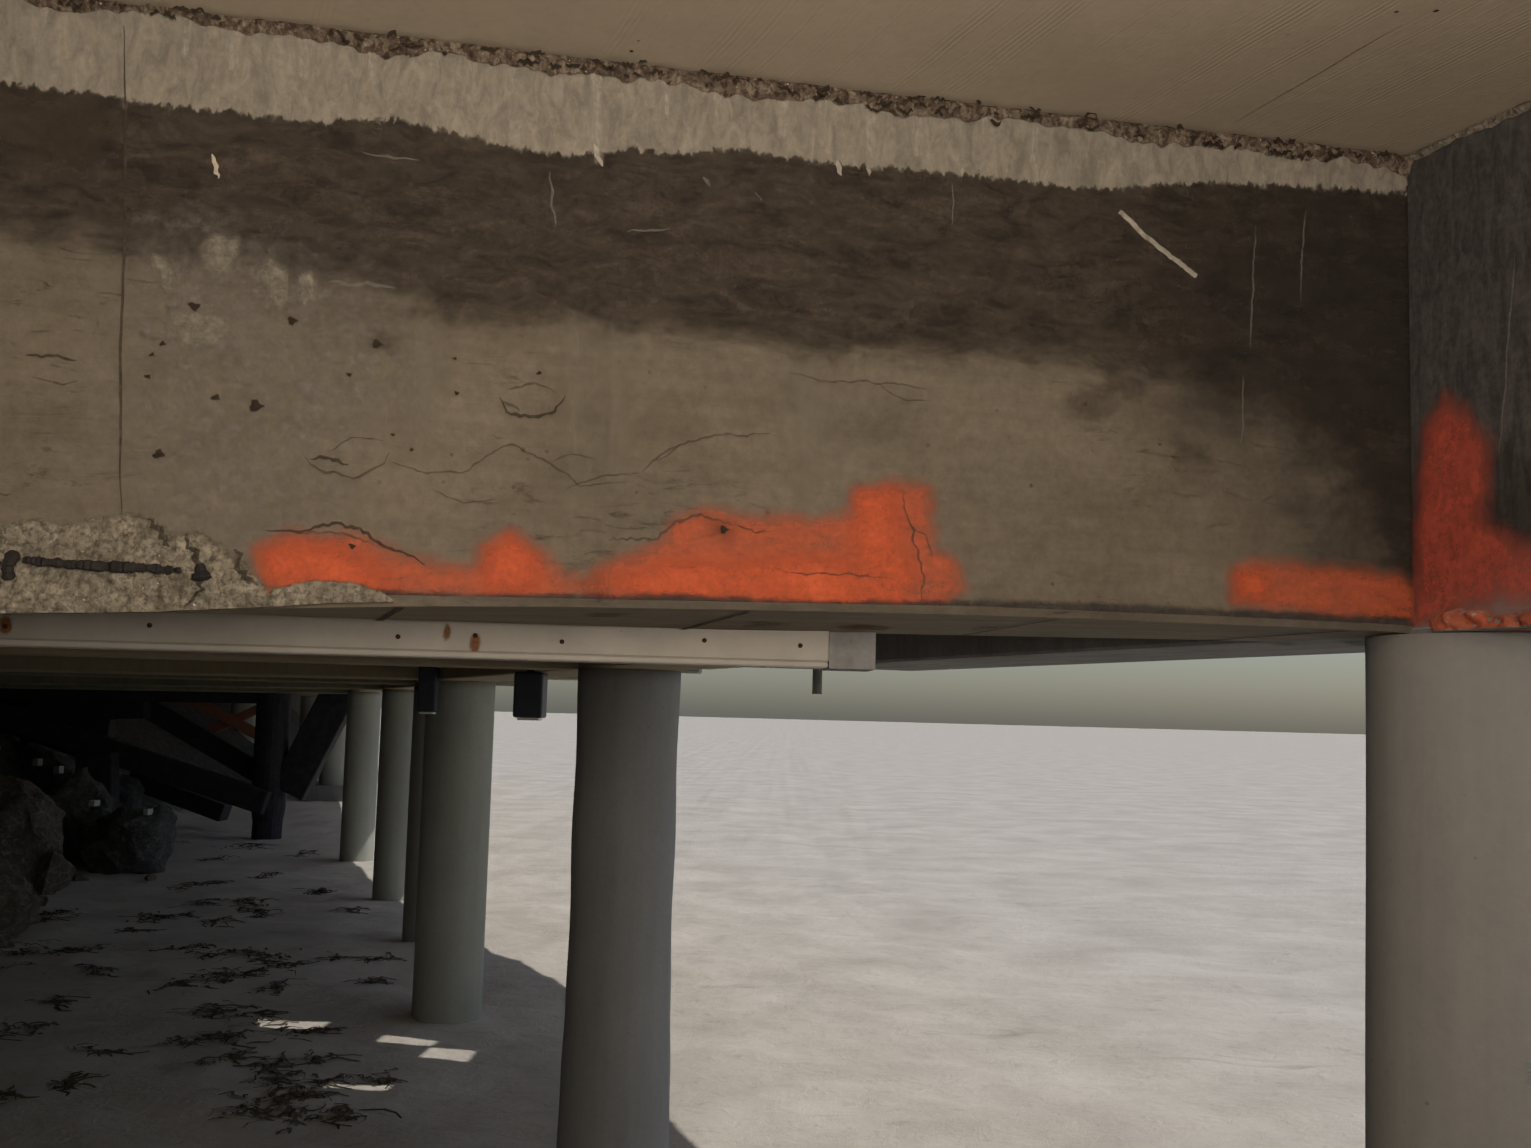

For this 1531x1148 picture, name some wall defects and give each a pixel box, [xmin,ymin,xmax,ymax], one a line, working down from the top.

peeling [202,234,238,276]
peeling [149,302,229,356]
peeling [261,260,316,325]
leakage [0,0,1531,626]
peeling [250,400,265,411]
crack [306,383,755,502]
spalling [0,512,393,613]
crack [266,521,425,565]